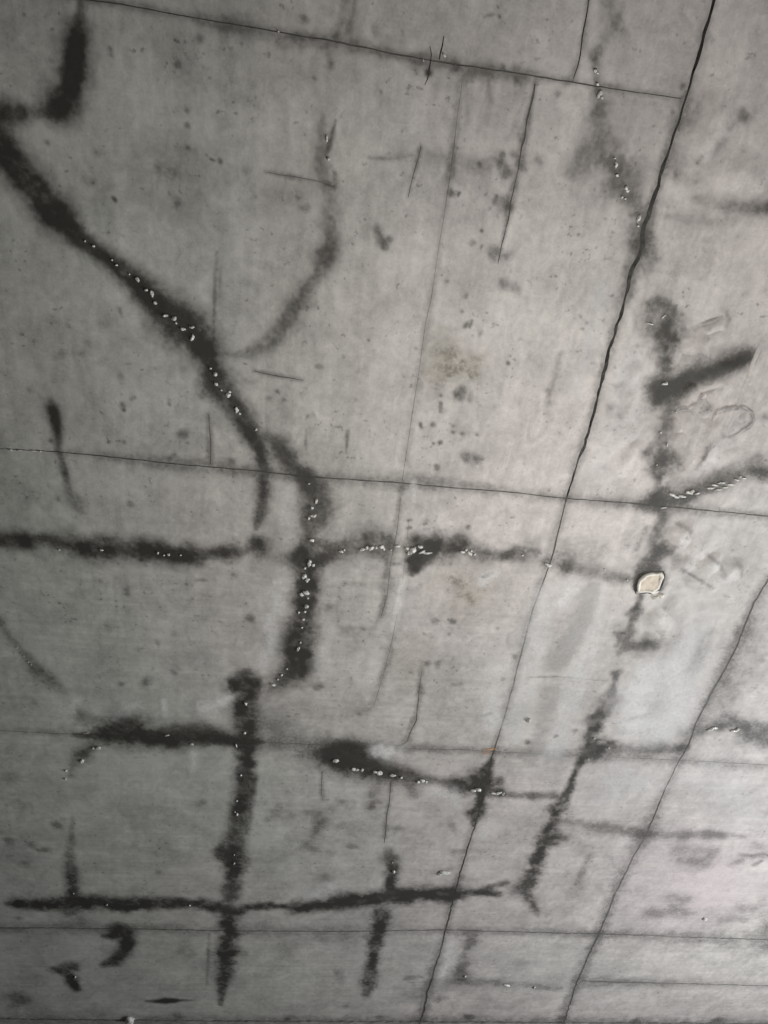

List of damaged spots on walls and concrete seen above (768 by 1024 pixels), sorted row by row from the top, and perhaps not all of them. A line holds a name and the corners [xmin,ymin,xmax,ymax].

crack [422,36,446,84]
crack [572,0,589,82]
crack [498,83,536,262]
leakage [0,4,534,1004]
leakage [618,298,768,651]
leakage [544,560,580,573]
leakage [640,742,689,753]
leakage [698,717,768,746]
leakage [521,706,622,911]